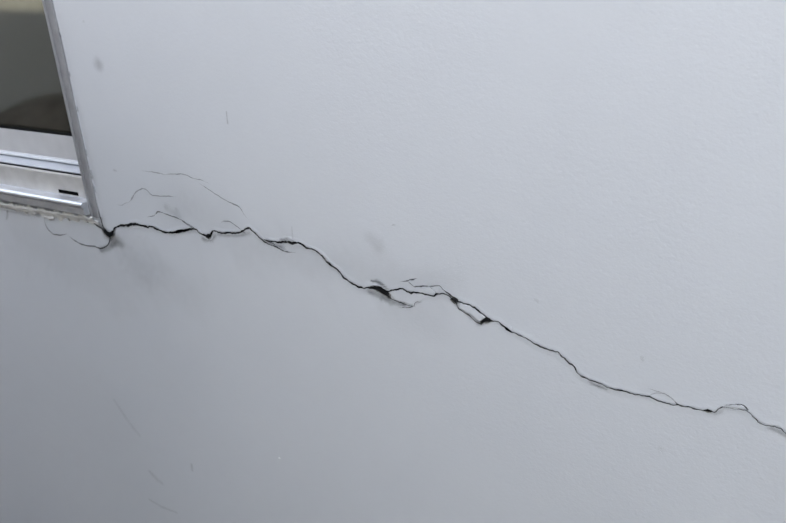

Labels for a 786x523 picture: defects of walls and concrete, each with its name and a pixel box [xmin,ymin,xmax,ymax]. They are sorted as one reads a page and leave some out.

crack [44,186,786,439]